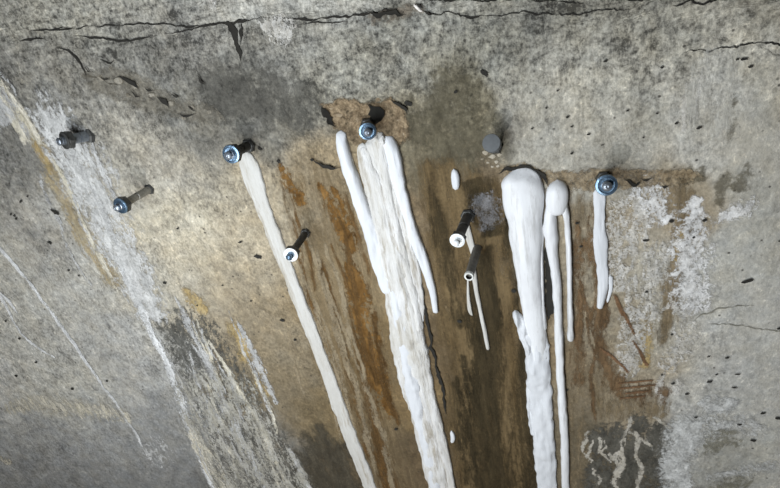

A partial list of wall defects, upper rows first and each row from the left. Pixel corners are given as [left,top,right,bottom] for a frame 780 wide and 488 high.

crack [21,0,644,85]
crack [676,0,717,8]
crack [683,42,780,55]
damp [0,65,377,488]
rust [278,161,414,488]
damp [336,66,574,488]
rust [566,189,672,488]
damp [593,169,759,398]
damp [581,395,777,488]
crack [695,305,780,332]